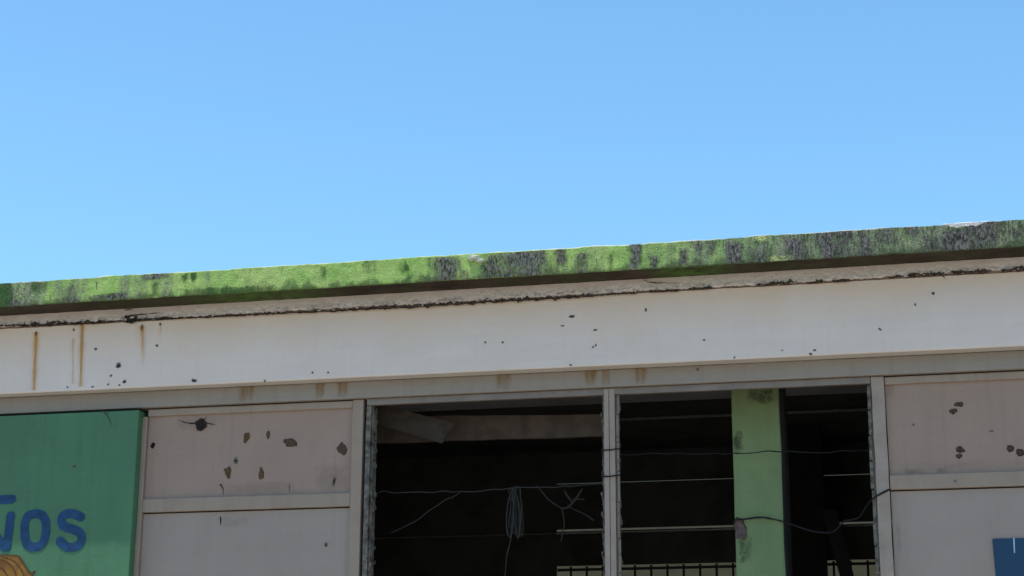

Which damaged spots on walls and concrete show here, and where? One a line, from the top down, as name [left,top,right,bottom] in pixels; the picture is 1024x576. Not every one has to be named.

mould [144,273,168,281]
mould [426,257,466,281]
mould [483,249,587,278]
mould [629,244,658,270]
mould [680,240,764,265]
mould [784,229,893,260]
mould [906,221,998,252]